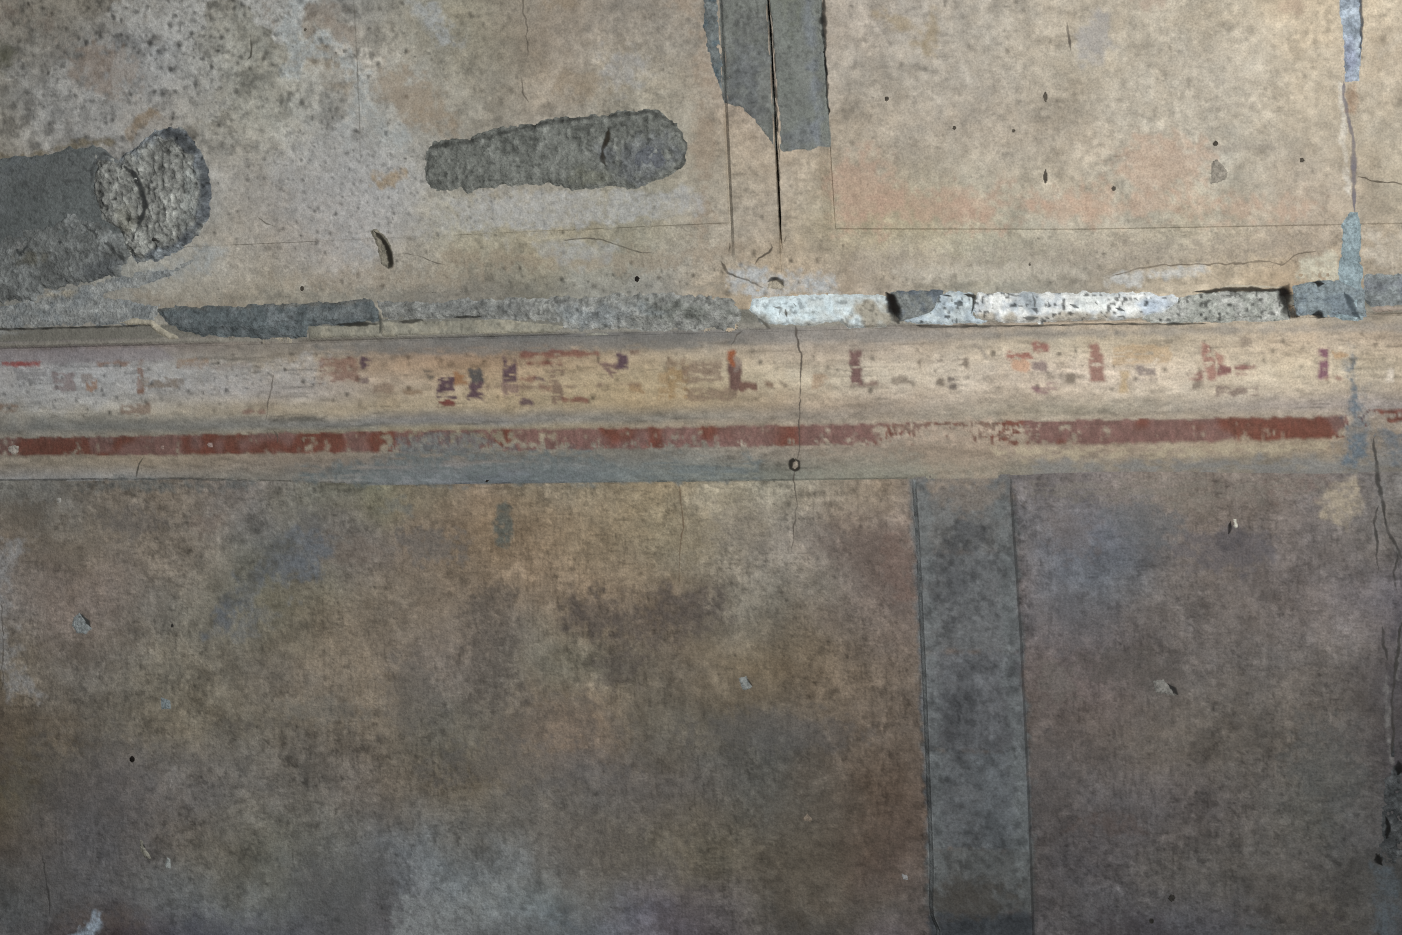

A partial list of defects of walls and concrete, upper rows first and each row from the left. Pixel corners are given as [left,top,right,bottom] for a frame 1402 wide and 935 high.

crack [1336,0,1397,212]
flaking render [749,277,1290,329]
crack [1371,442,1402,767]
flaking render [1375,743,1402,866]